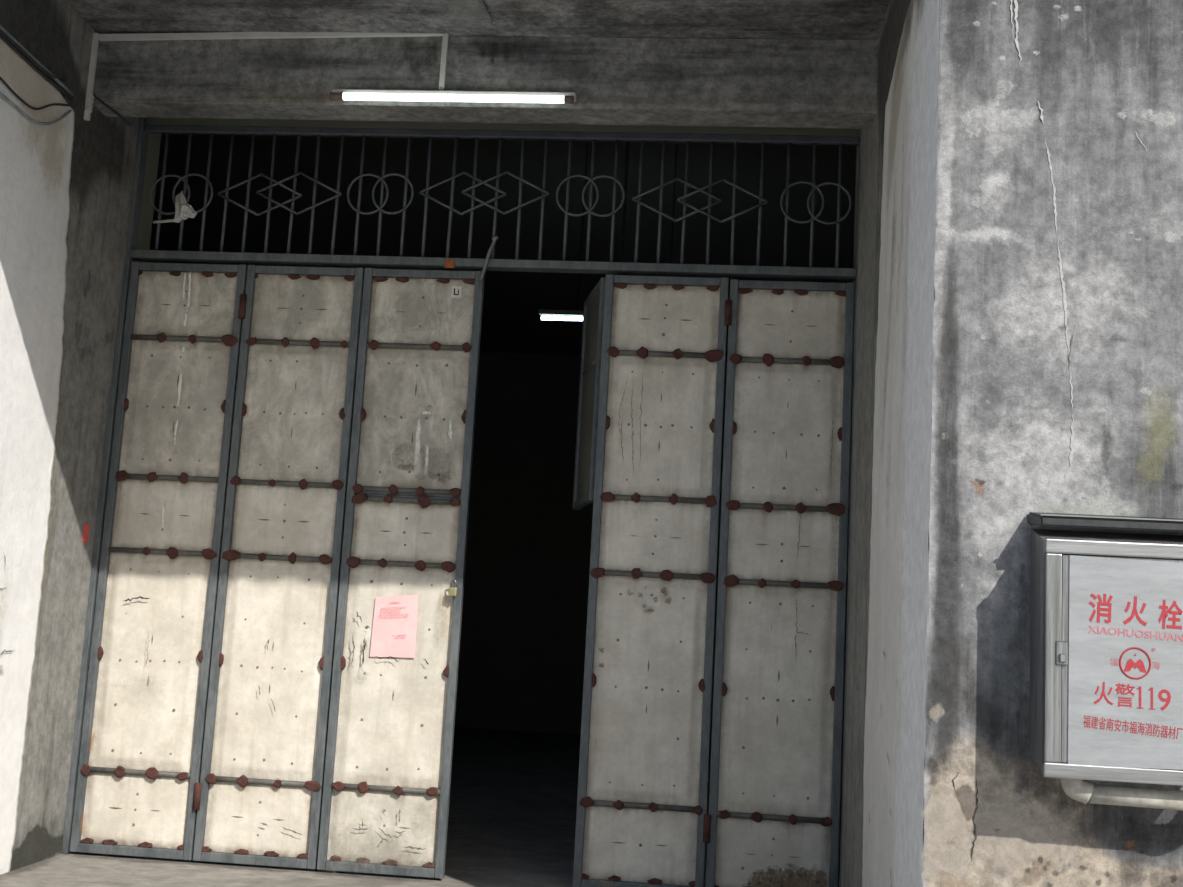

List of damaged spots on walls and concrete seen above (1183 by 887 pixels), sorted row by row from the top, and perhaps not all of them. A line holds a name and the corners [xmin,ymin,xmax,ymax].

crack [1010,0,1022,65]
crack [1038,102,1075,476]